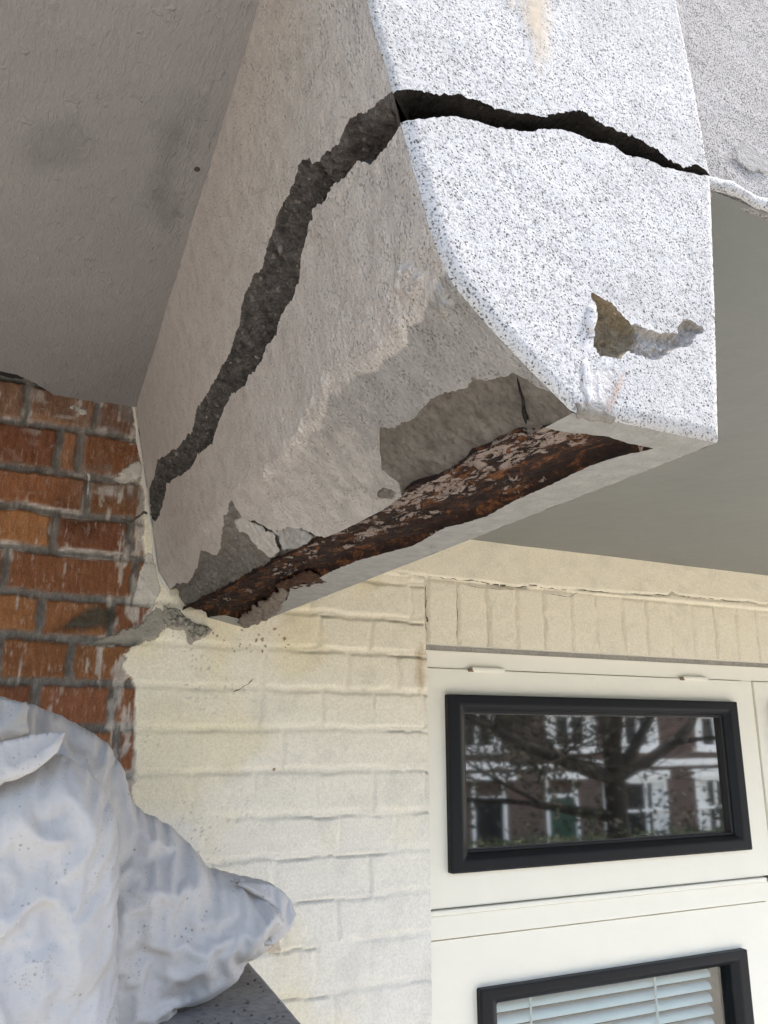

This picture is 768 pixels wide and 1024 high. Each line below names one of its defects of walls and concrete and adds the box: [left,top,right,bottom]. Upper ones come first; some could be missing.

crack [118,89,709,523]
spalling [0,371,49,392]
spalling [377,293,704,499]
peeling [113,461,145,485]
spalling [132,501,317,645]
rust [182,422,653,653]
crack [421,576,768,642]